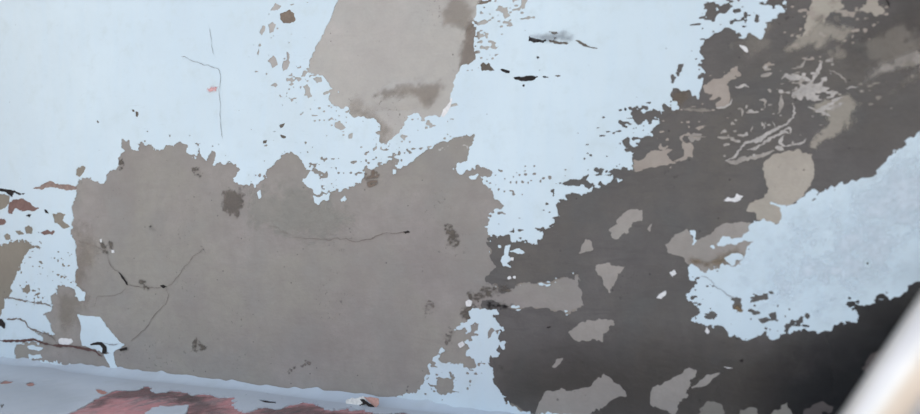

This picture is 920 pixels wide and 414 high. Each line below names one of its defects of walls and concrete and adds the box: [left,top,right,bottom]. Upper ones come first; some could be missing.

crack [182,35,223,138]
peeling [286,0,535,151]
crack [0,240,203,357]
peeling [145,405,189,414]
peeling [0,134,584,400]
crack [250,215,410,242]
peeling [481,0,920,414]
water stain [784,290,920,414]